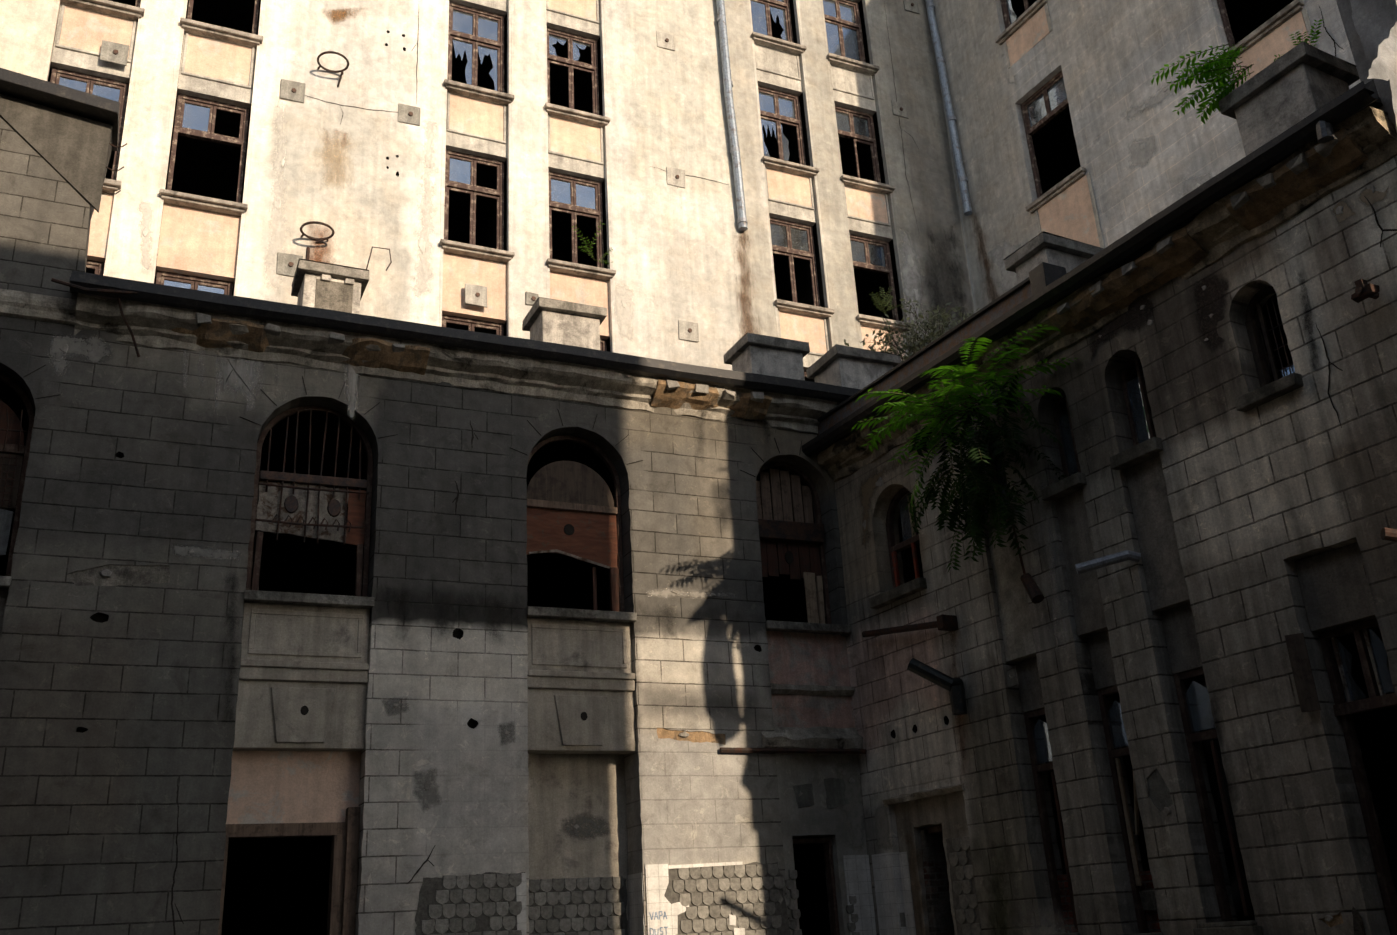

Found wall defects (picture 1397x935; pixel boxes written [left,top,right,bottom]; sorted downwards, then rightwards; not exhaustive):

crack [1364,196,1397,247]
spalling [171,312,281,352]
peeling [49,336,110,373]
spalling [328,332,430,375]
spalling [657,728,725,745]